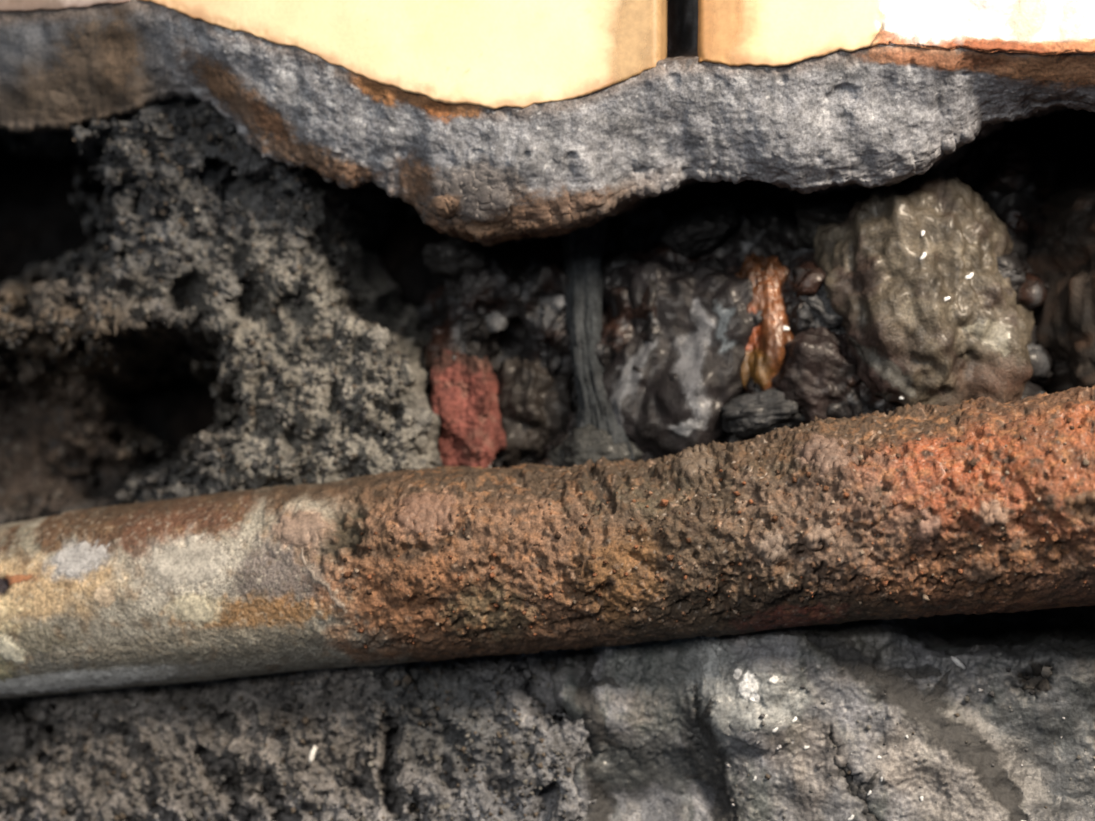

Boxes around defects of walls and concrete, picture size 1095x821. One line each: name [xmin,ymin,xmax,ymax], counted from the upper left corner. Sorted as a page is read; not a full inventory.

corrosion [868,31,1095,86]
corrosion [184,52,381,188]
corrosion [741,257,794,391]
corrosion [671,444,716,479]
corrosion [793,434,860,478]
corrosion [391,492,460,536]
corrosion [755,524,835,566]
corrosion [916,509,940,543]
corrosion [972,499,1009,528]
crack [806,632,1028,821]